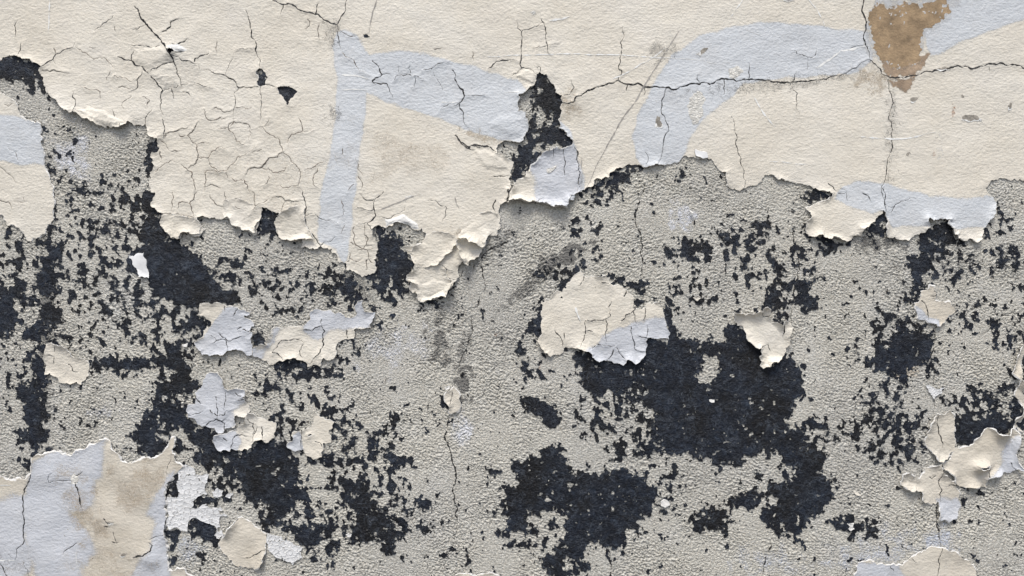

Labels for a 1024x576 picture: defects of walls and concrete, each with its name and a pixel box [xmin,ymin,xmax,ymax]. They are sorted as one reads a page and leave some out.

crack [42,6,406,266]
peeling [0,0,1024,405]
crack [563,0,1024,211]
peeling [0,372,390,576]
peeling [439,386,462,415]
peeling [453,550,499,576]
peeling [516,259,670,445]
peeling [853,546,976,576]
peeling [859,310,1024,523]